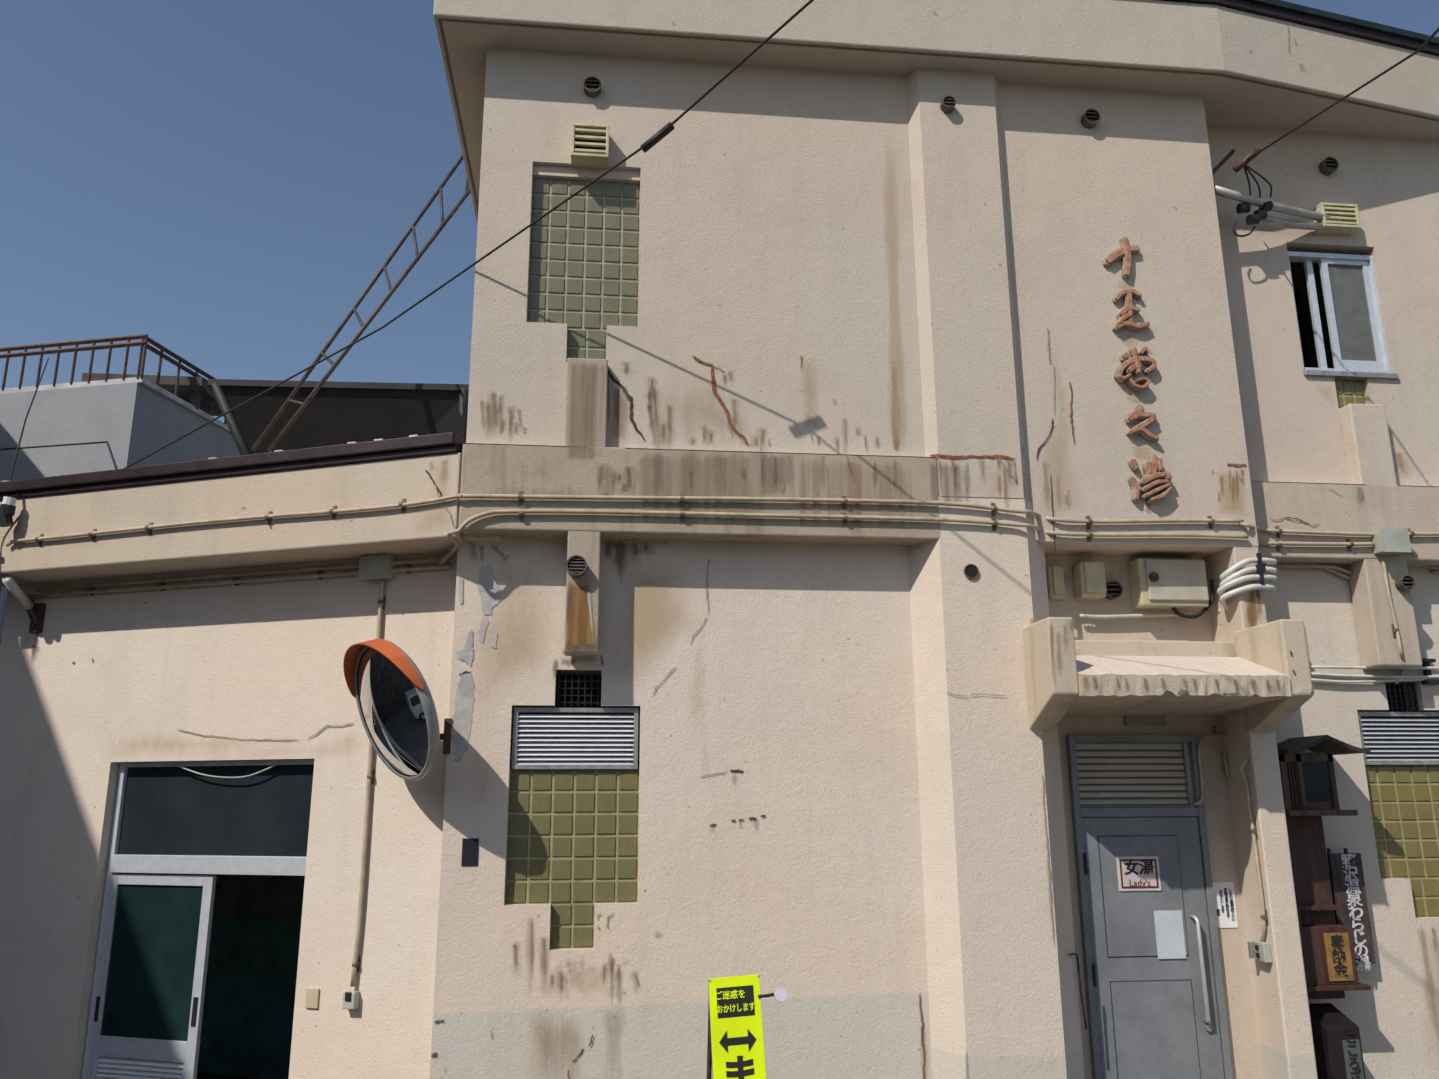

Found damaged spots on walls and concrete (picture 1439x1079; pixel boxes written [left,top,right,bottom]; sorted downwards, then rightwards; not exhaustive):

crack [608,369,645,441]
crack [693,356,748,445]
peeling [452,566,502,762]
crack [177,723,353,741]